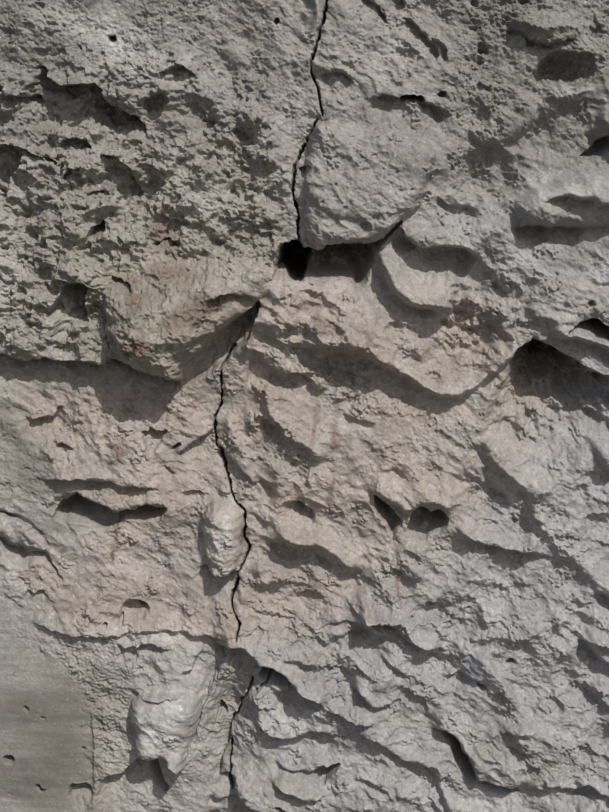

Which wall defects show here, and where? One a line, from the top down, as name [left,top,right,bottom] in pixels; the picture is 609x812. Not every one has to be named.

crack [291,0,329,243]
crack [180,343,252,645]
crack [229,668,274,790]